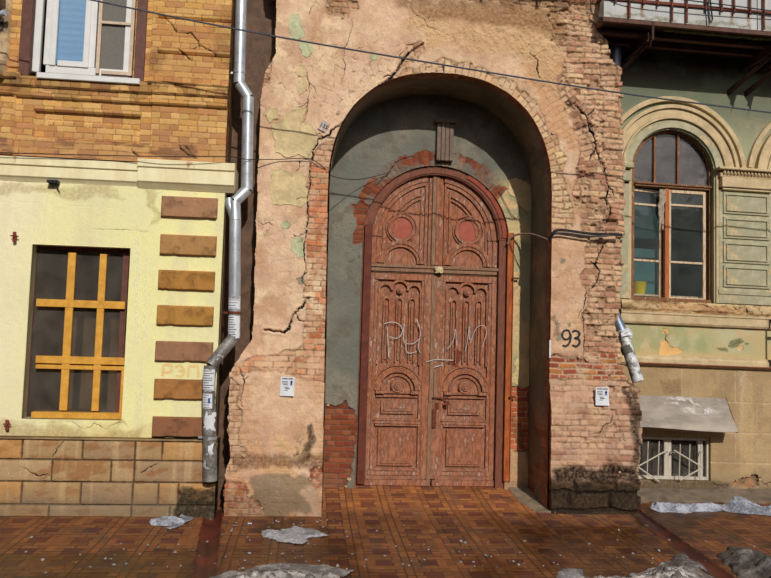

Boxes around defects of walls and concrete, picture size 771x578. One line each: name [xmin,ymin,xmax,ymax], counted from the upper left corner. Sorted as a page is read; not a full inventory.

crack [166,19,213,60]
spalling [326,0,359,18]
crack [377,44,423,88]
spalling [223,107,335,516]
crack [267,75,342,333]
spalling [393,0,643,517]
crack [574,104,614,222]
peeling [659,327,684,355]
spalling [309,400,357,488]
damp [551,390,725,517]